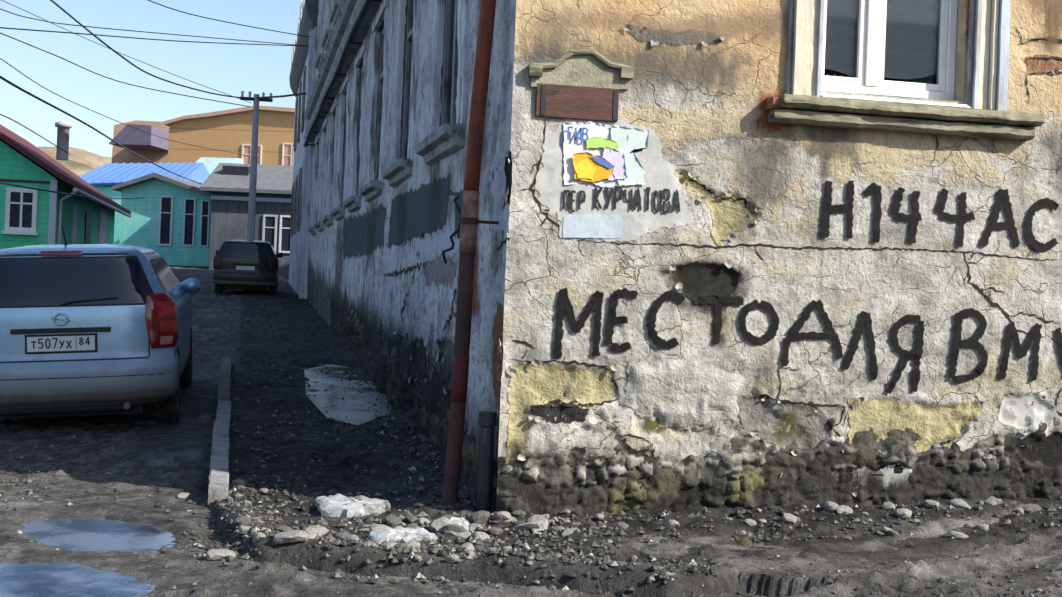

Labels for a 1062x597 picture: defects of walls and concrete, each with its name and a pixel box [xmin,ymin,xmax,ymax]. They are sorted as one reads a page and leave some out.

damp [1037,0,1062,49]
flaking render [1025,54,1062,76]
damp [335,229,343,282]
peeling [410,225,460,287]
crack [522,118,1061,334]
damp [330,298,452,423]
flaking render [492,302,618,470]
crack [499,330,619,396]
crack [618,434,654,457]
crack [746,367,847,437]
flaking render [738,397,984,500]
flaking render [998,393,1057,435]